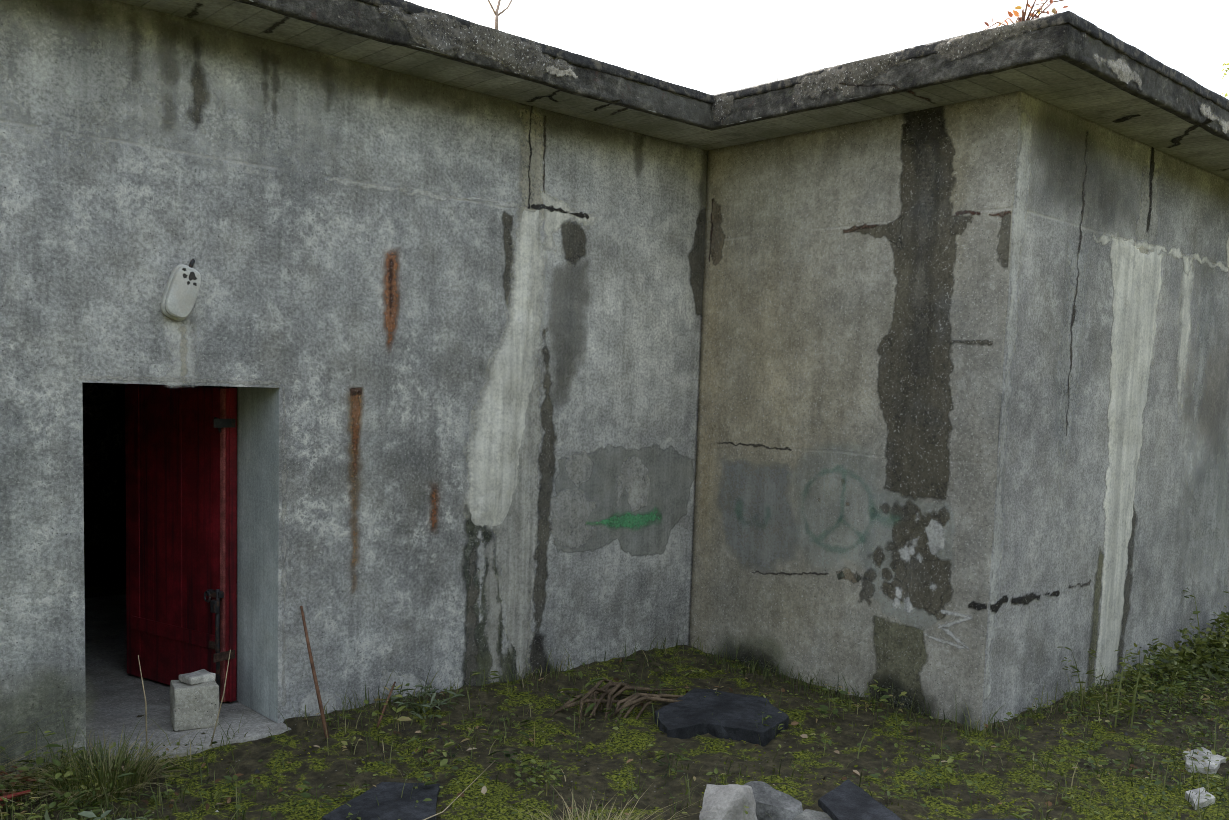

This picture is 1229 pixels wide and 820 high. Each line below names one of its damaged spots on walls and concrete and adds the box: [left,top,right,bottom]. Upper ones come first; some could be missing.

crack [526,90,589,219]
crack [594,100,633,115]
water stain [0,11,657,686]
rust [384,251,399,346]
water stain [843,106,1229,699]
rust [348,387,362,588]
rust [430,485,438,531]
peeling [752,500,954,620]
crack [968,579,1091,613]
water stain [869,616,932,717]